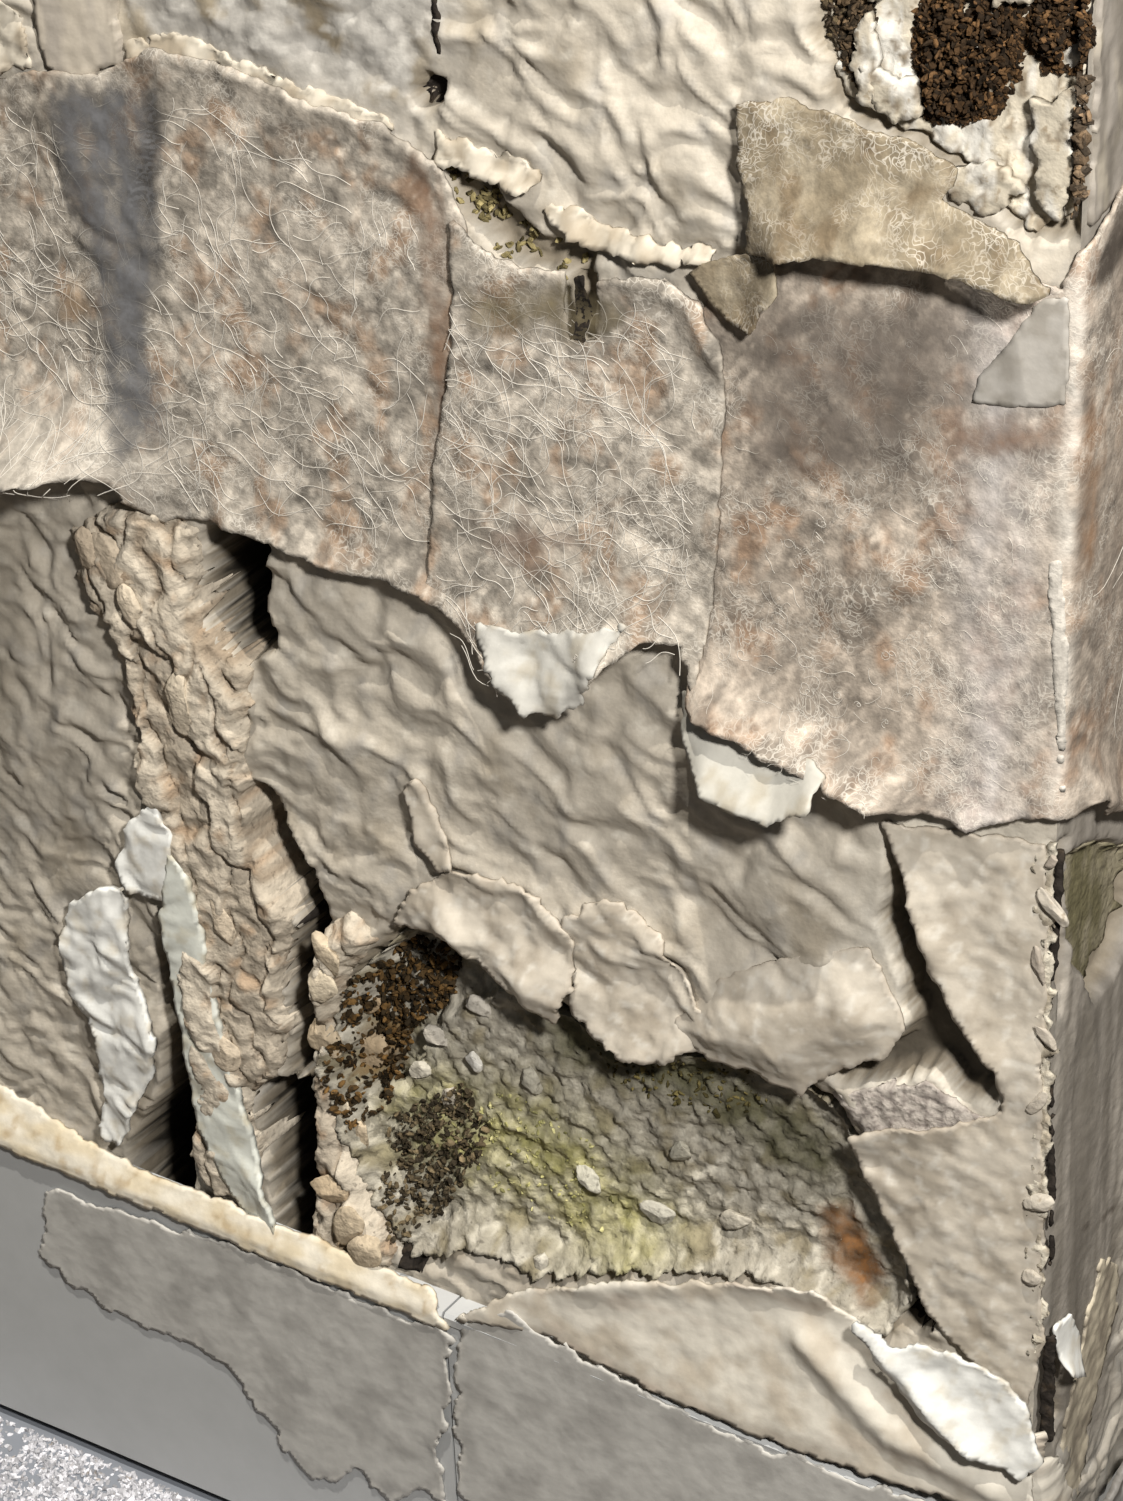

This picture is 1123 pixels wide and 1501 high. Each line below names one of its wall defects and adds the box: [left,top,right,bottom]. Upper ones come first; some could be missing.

crack [423,0,448,103]
spalling [830,0,1095,231]
crack [296,898,332,929]
spalling [39,501,1123,1501]
corrosion [826,1207,882,1291]